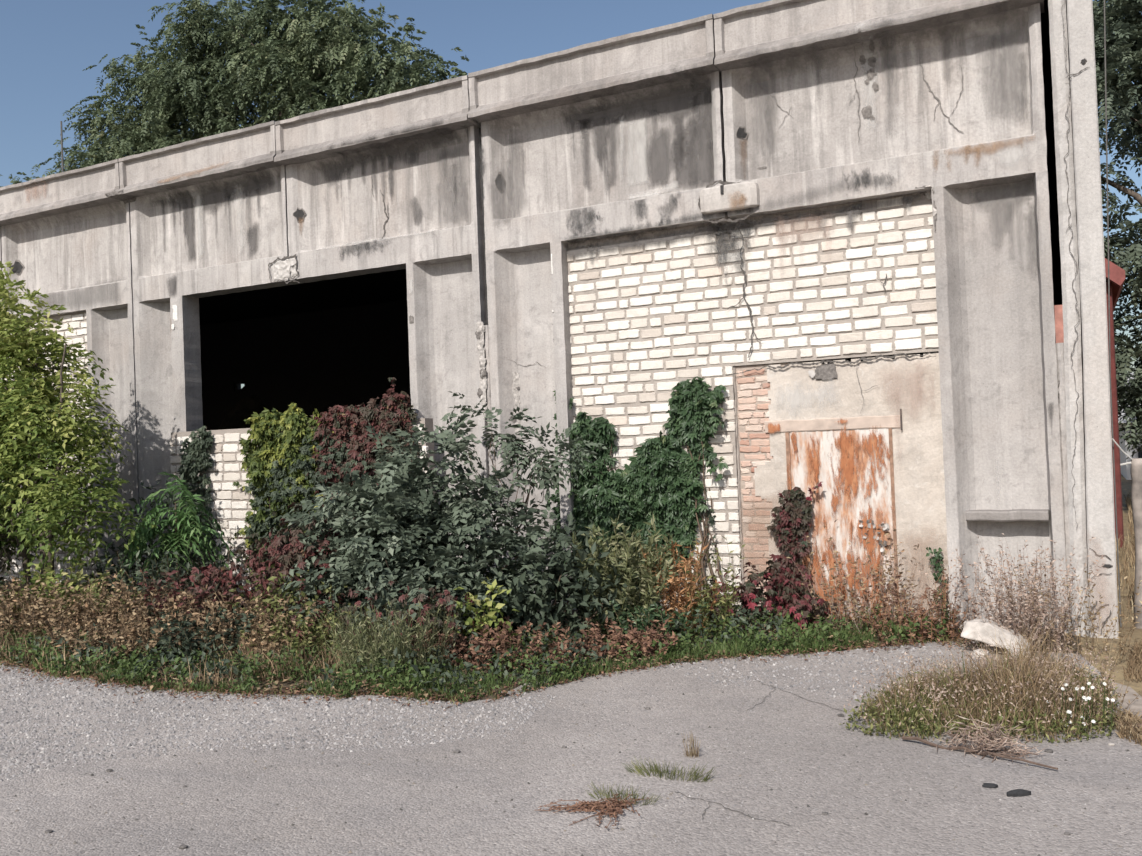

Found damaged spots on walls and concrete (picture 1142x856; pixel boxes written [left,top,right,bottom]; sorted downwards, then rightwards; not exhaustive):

crack [850,45,861,142]
peeling [858,29,878,120]
crack [919,56,964,133]
water stain [155,169,273,258]
water stain [321,122,468,192]
water stain [413,199,429,232]
water stain [565,72,919,269]
crack [698,180,936,414]
spalling [475,322,487,419]
corrosion [768,420,894,620]